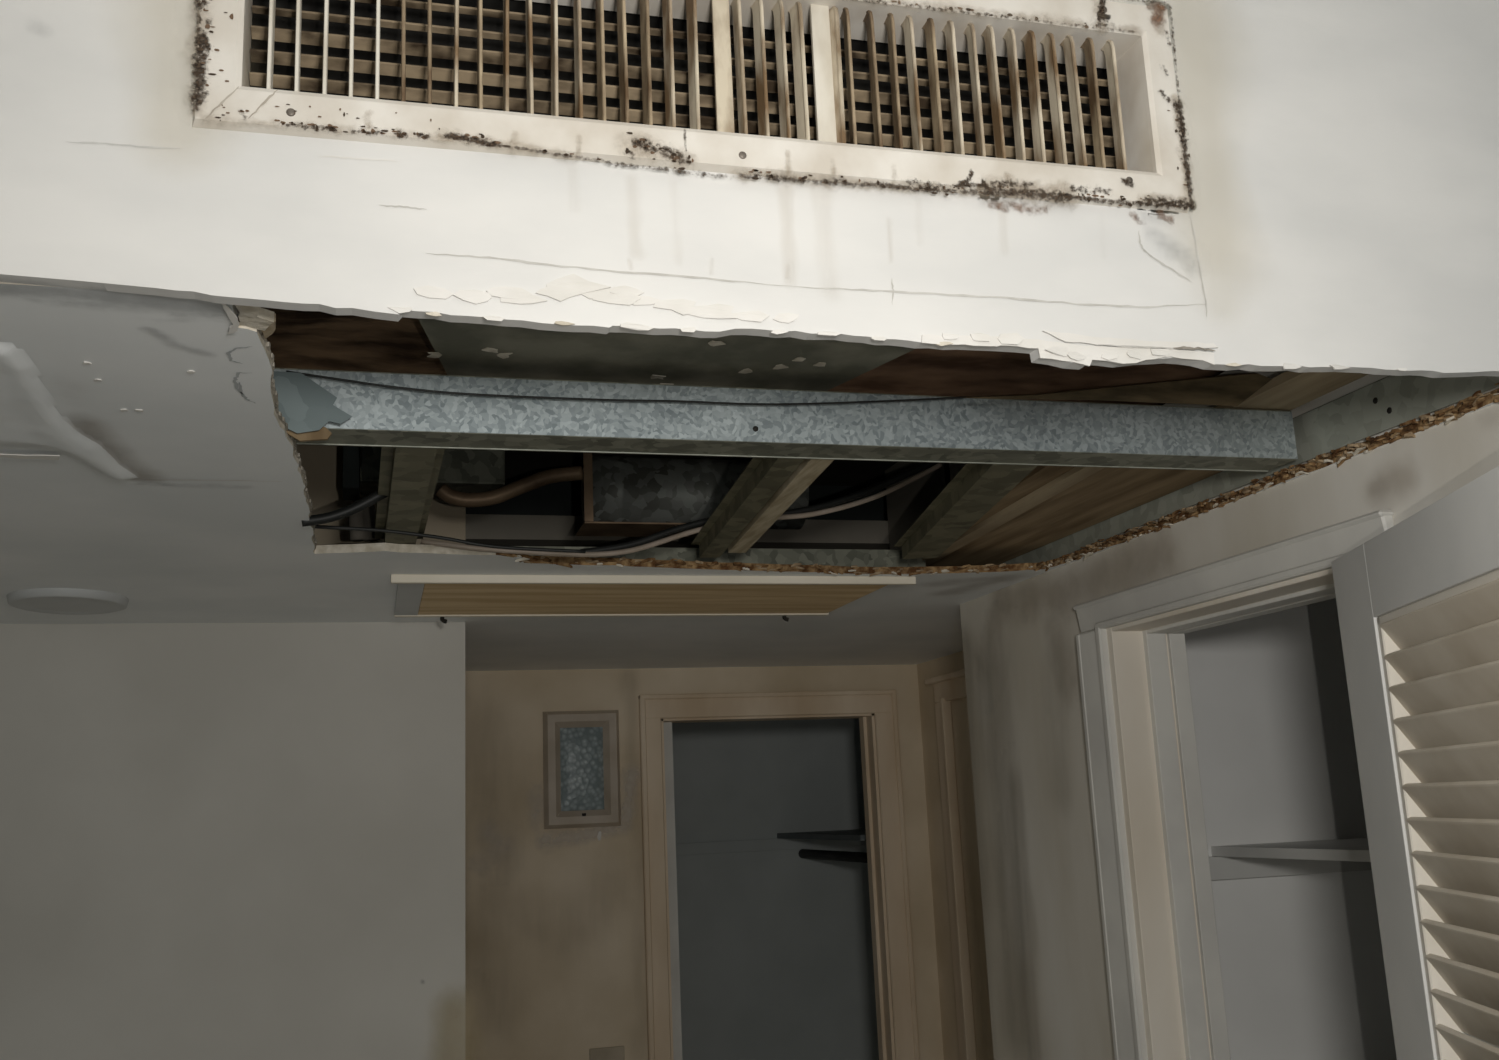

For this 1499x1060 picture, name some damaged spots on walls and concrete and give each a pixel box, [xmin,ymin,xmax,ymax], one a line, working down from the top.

water stain [190,0,249,121]
water stain [274,0,1195,210]
peeling [259,330,317,550]
spalling [499,383,1499,576]
peeling [921,331,1241,367]